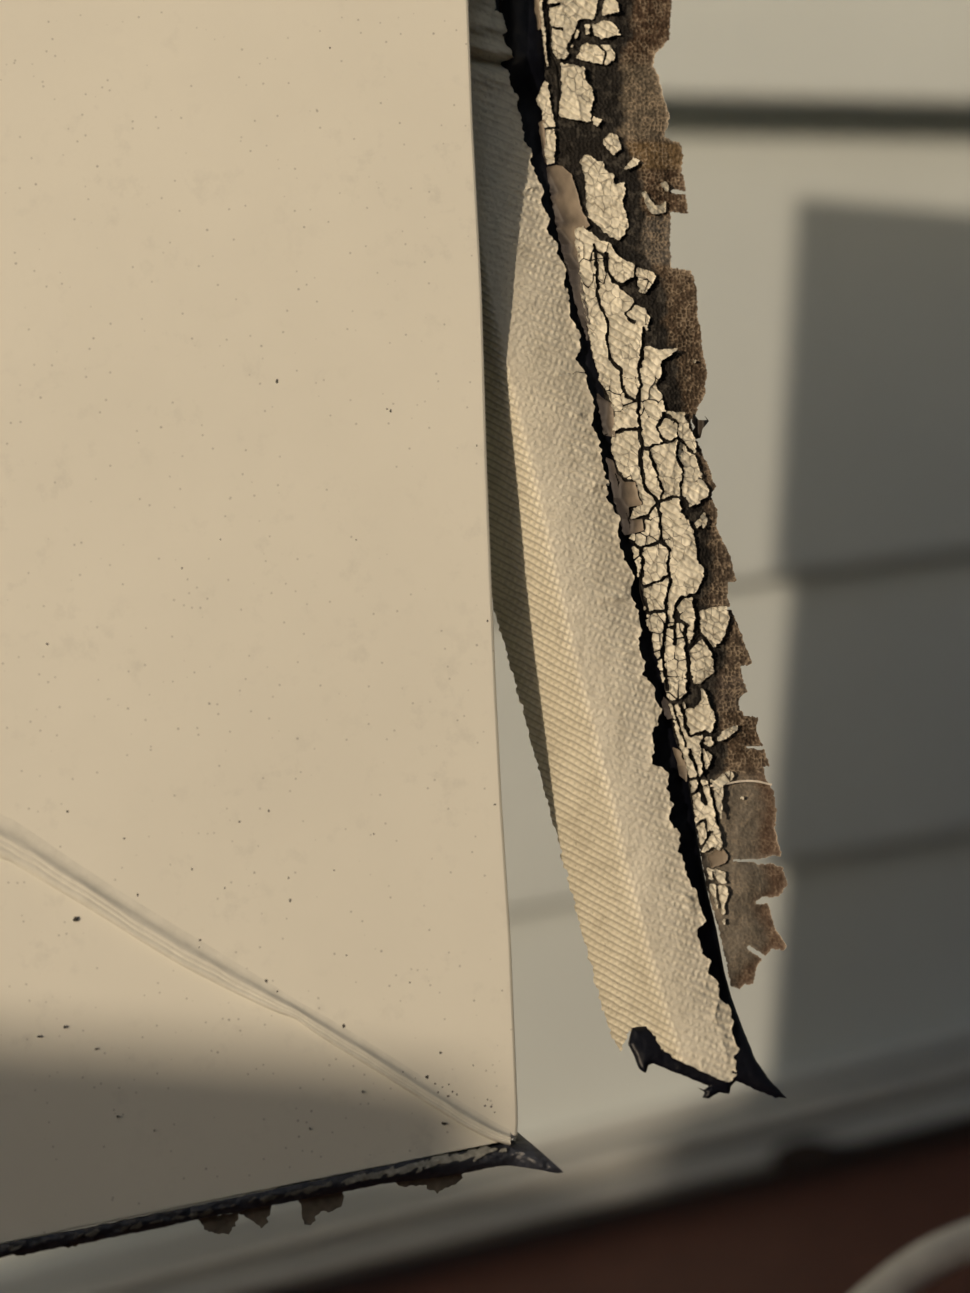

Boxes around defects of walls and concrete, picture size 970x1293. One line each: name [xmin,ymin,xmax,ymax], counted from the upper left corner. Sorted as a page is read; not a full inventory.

peeling [536,0,738,852]
peeling [707,868,729,925]